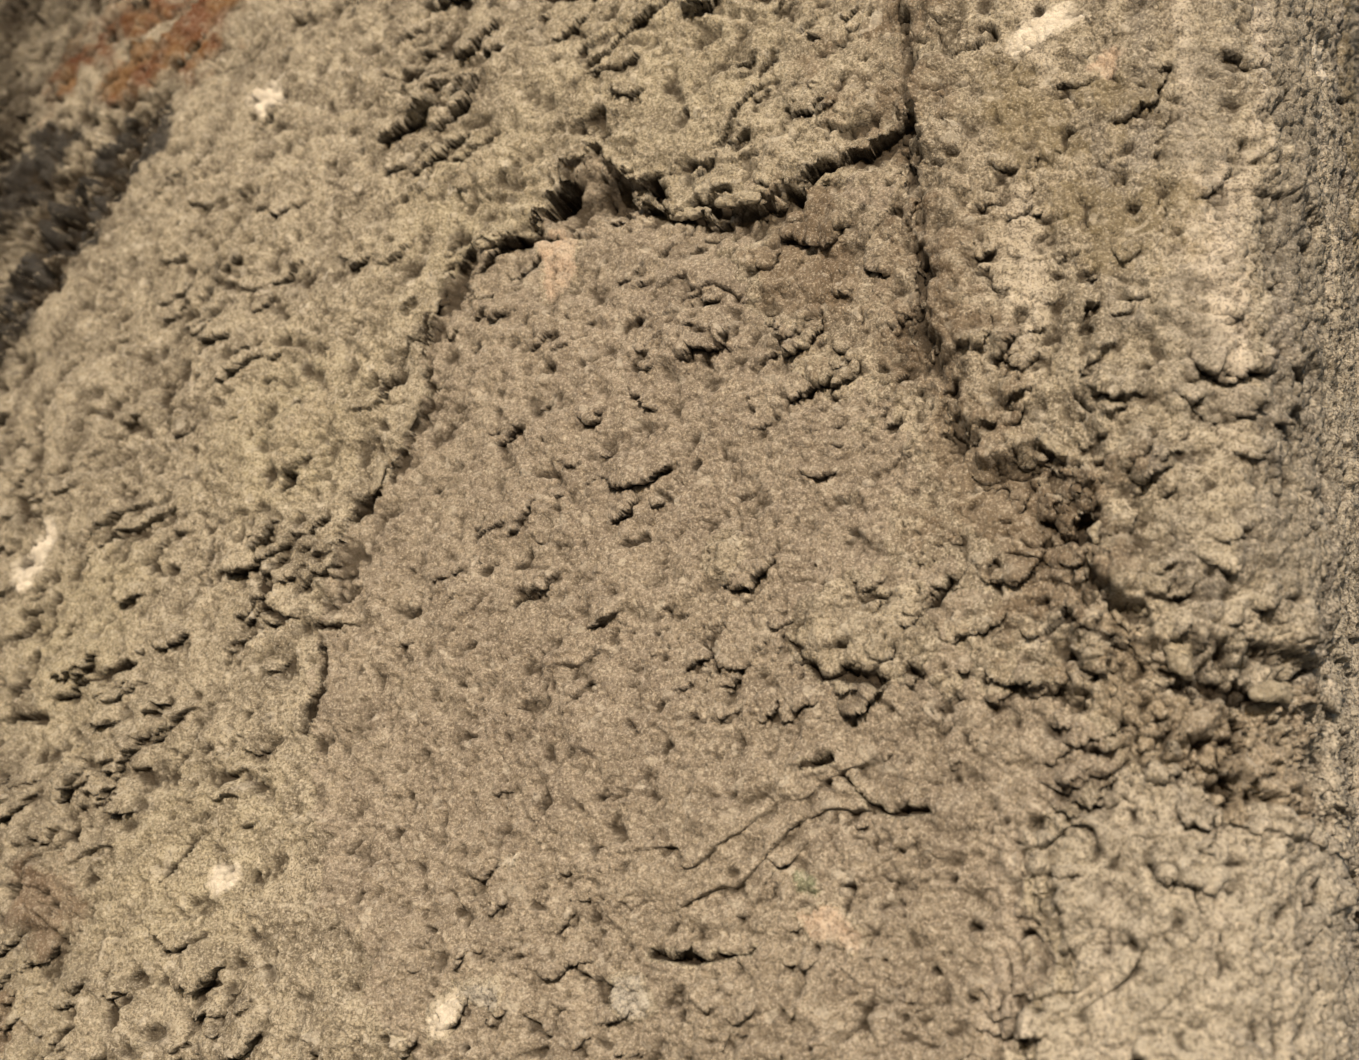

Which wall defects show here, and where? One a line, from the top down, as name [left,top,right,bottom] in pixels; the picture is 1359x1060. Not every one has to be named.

rust [28,0,258,136]
crack [1344,817,1359,983]
crack [1127,1052,1146,1060]